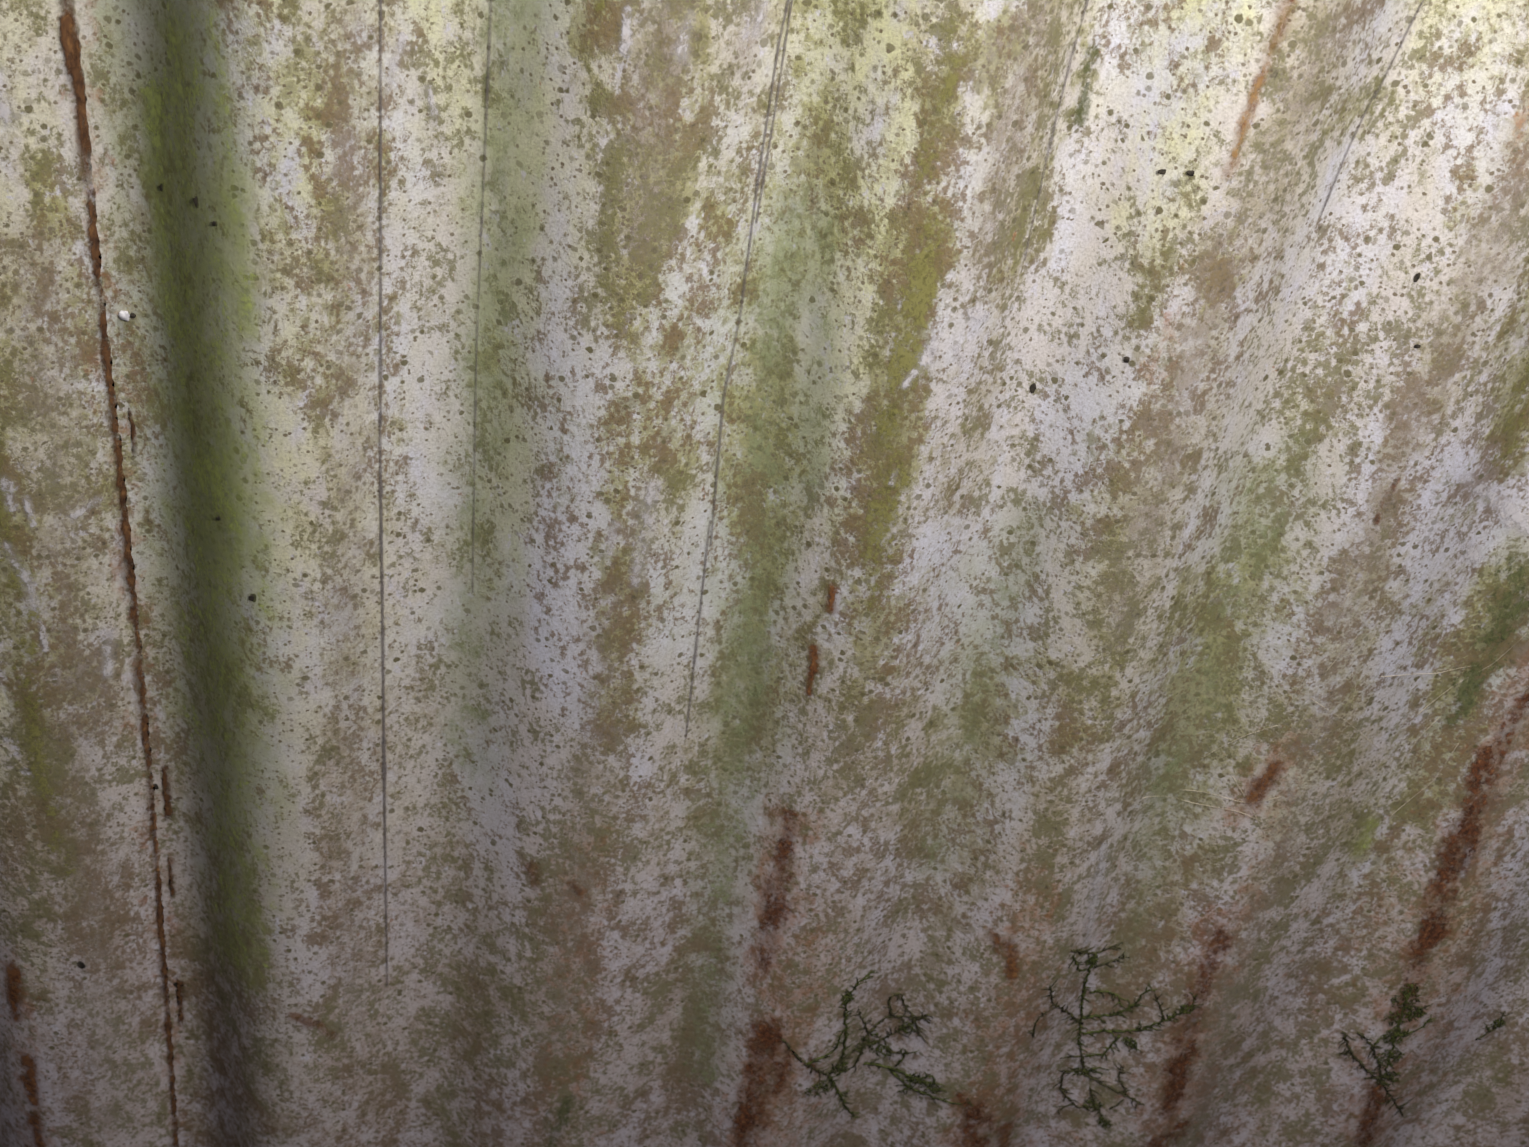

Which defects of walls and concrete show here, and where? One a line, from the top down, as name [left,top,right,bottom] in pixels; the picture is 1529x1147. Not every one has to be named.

corrosion [1231,53,1271,168]
leakage [140,0,268,967]
corrosion [60,0,184,1147]
corrosion [759,808,799,970]
corrosion [1391,693,1529,1020]
corrosion [6,962,23,1021]
corrosion [21,1054,46,1147]
corrosion [731,1018,792,1147]